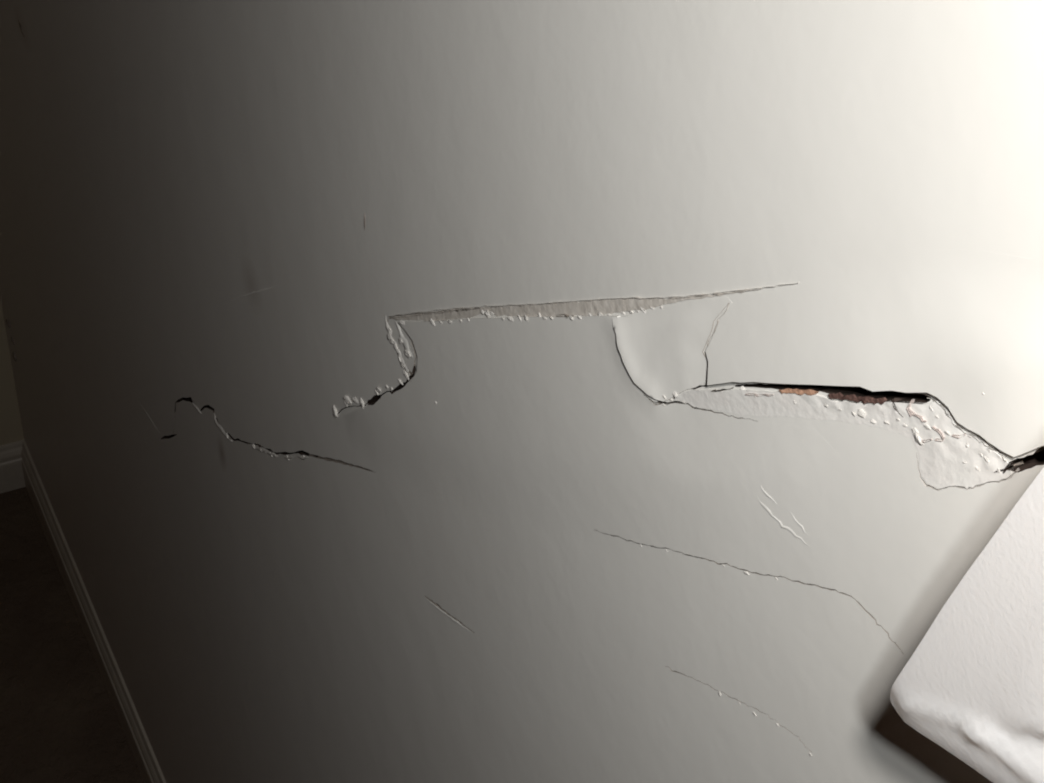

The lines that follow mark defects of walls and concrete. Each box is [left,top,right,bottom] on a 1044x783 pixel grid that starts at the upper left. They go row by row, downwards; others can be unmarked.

crack [136,397,376,473]
crack [333,315,416,418]
flaking render [388,284,1012,489]
crack [596,530,904,655]